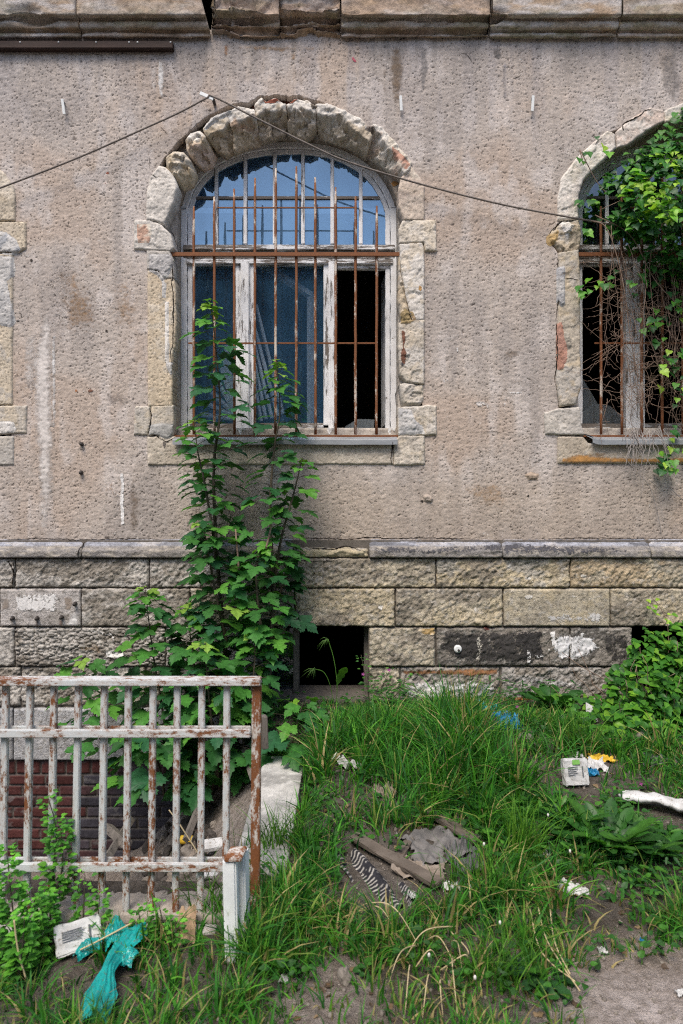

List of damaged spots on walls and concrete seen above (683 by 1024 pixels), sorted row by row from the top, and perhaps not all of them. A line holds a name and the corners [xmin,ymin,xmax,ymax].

spalling [556,322,572,370]
leakage [25,318,55,527]
rust [563,453,683,463]
leakage [547,613,602,660]